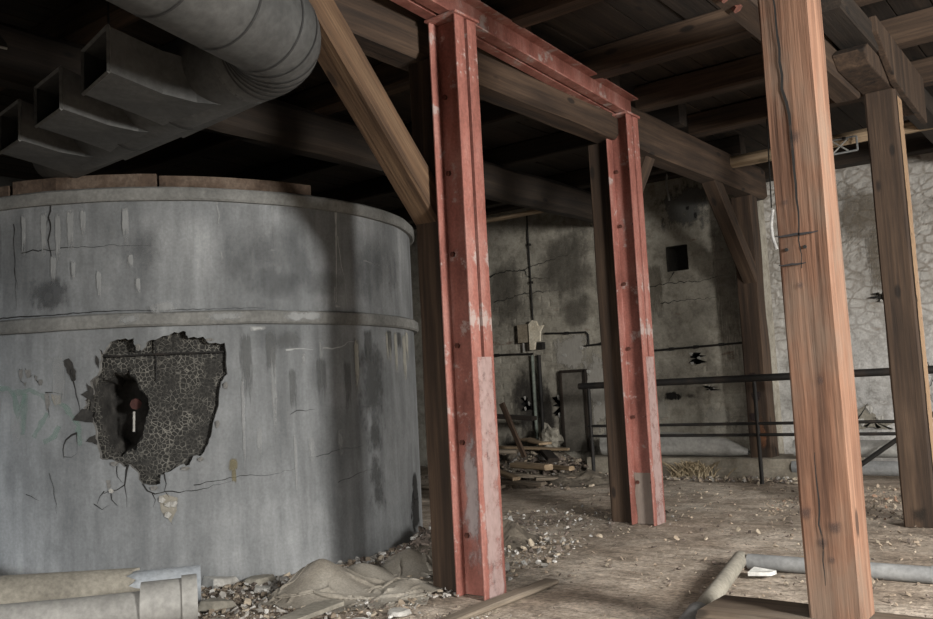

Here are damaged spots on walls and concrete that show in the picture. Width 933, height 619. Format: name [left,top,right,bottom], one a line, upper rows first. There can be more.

damp [33,210,86,307]
crack [13,206,147,293]
crack [0,307,256,319]
damp [288,312,320,321]
damp [241,327,409,411]
spalling [63,331,228,523]
crack [94,465,291,510]
damp [372,460,383,501]
damp [411,474,420,532]
crack [814,452,826,586]